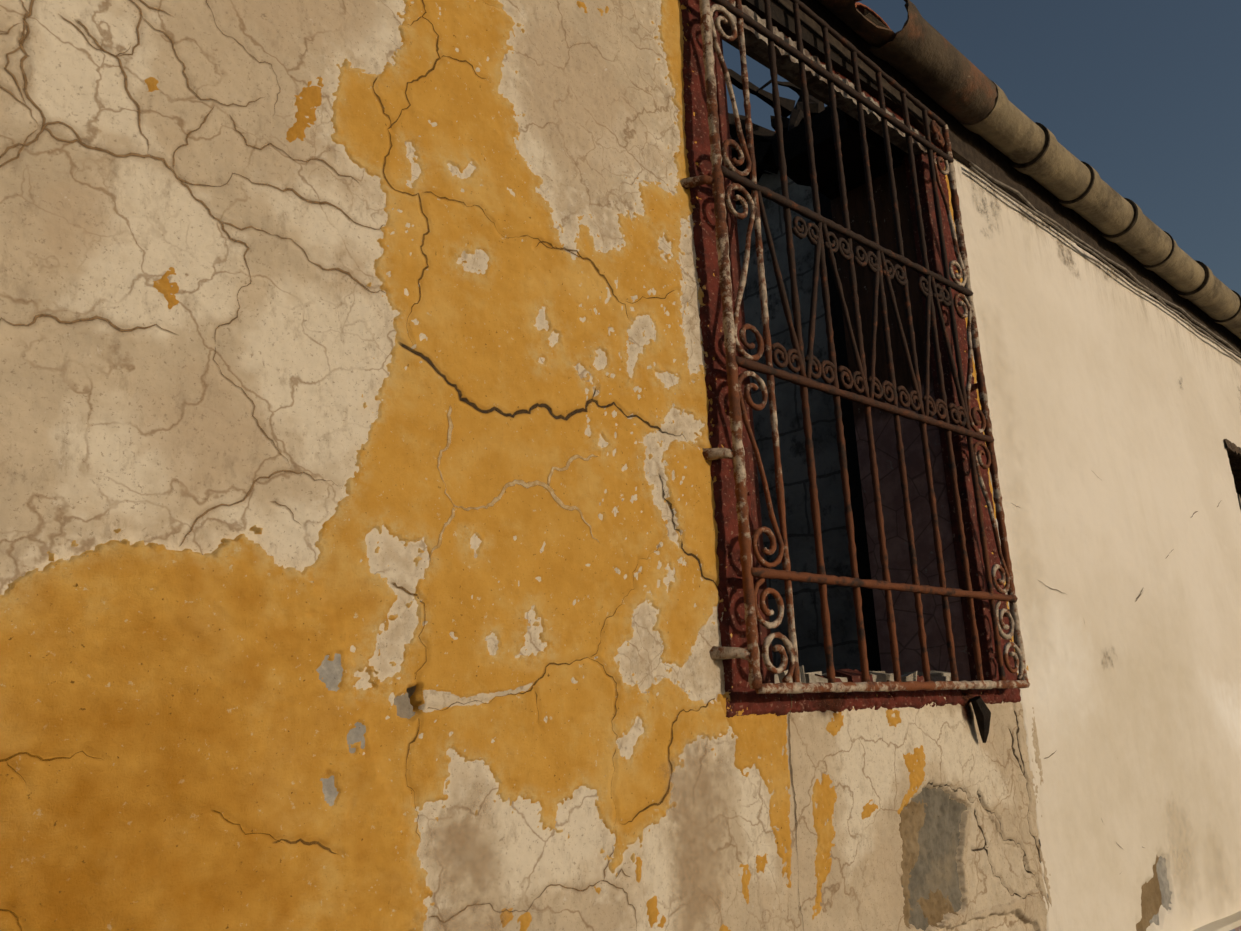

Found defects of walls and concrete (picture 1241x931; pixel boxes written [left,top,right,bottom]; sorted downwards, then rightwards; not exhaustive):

peeling [475,0,681,260]
peeling [0,0,428,595]
crack [0,0,693,560]
spalling [347,722,366,755]
crack [393,583,427,680]
peeling [316,525,533,723]
crack [405,475,722,931]
peeling [414,214,1052,931]
crack [789,694,804,931]
rust [961,690,973,724]
crack [928,711,1056,903]
peeling [1136,856,1172,931]